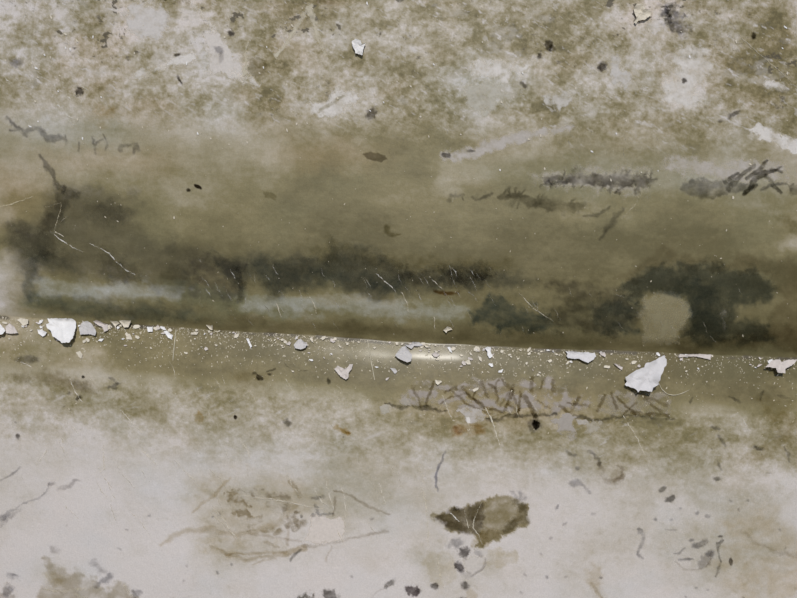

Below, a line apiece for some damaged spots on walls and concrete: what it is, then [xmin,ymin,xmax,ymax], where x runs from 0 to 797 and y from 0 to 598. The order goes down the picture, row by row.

peeling [0,317,182,358]
peeling [268,336,360,361]
peeling [334,364,353,379]
peeling [609,352,670,414]
peeling [749,357,797,376]